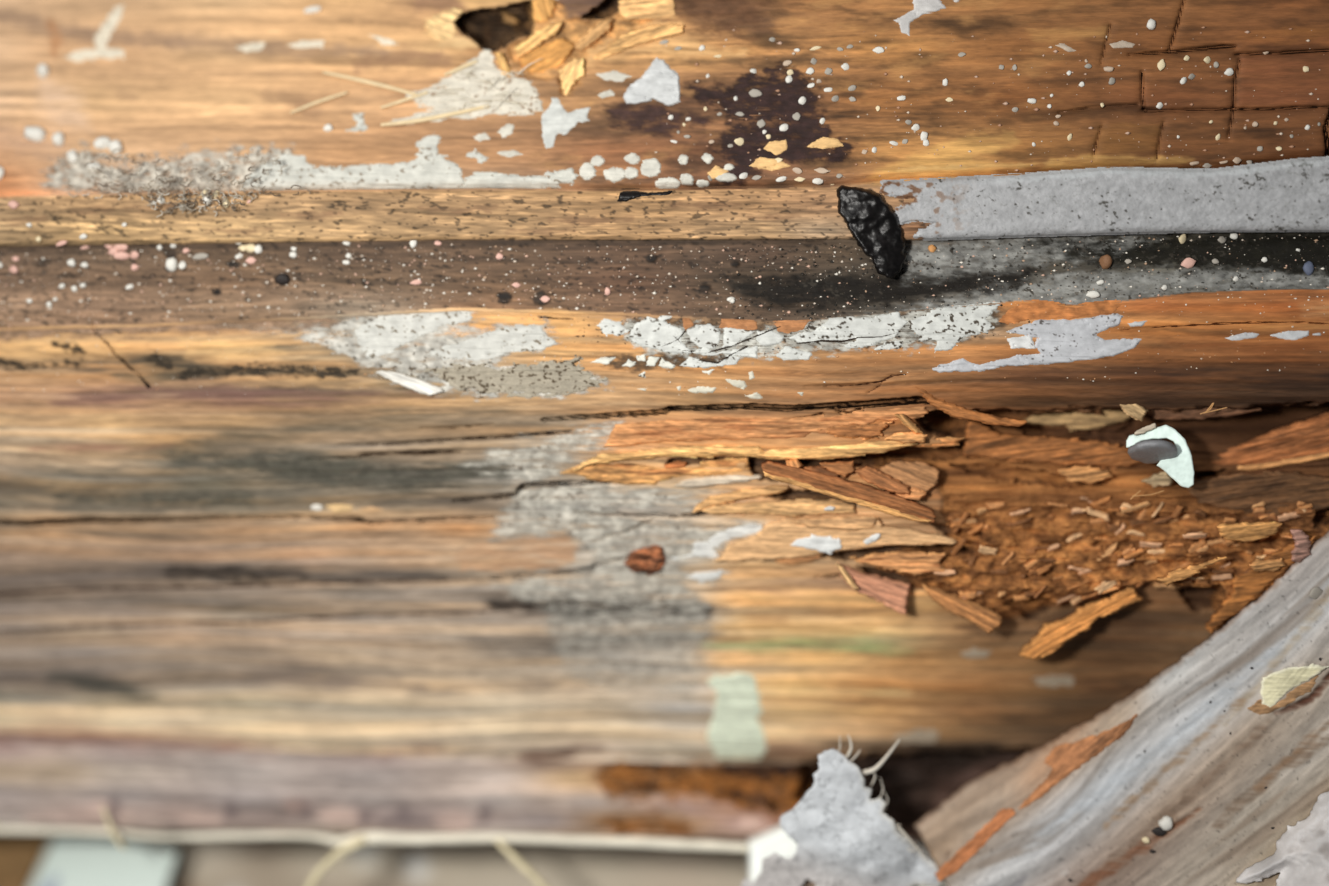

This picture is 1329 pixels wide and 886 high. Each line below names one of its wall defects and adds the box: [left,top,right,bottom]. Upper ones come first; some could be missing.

peeling [240,49,790,191]
water stain [606,62,853,185]
crack [1070,0,1329,159]
peeling [354,311,473,358]
peeling [423,299,1147,400]
peeling [1226,331,1321,341]
crack [0,480,709,632]
peeling [672,524,763,583]
peeling [791,534,842,555]
spalling [854,401,1329,630]